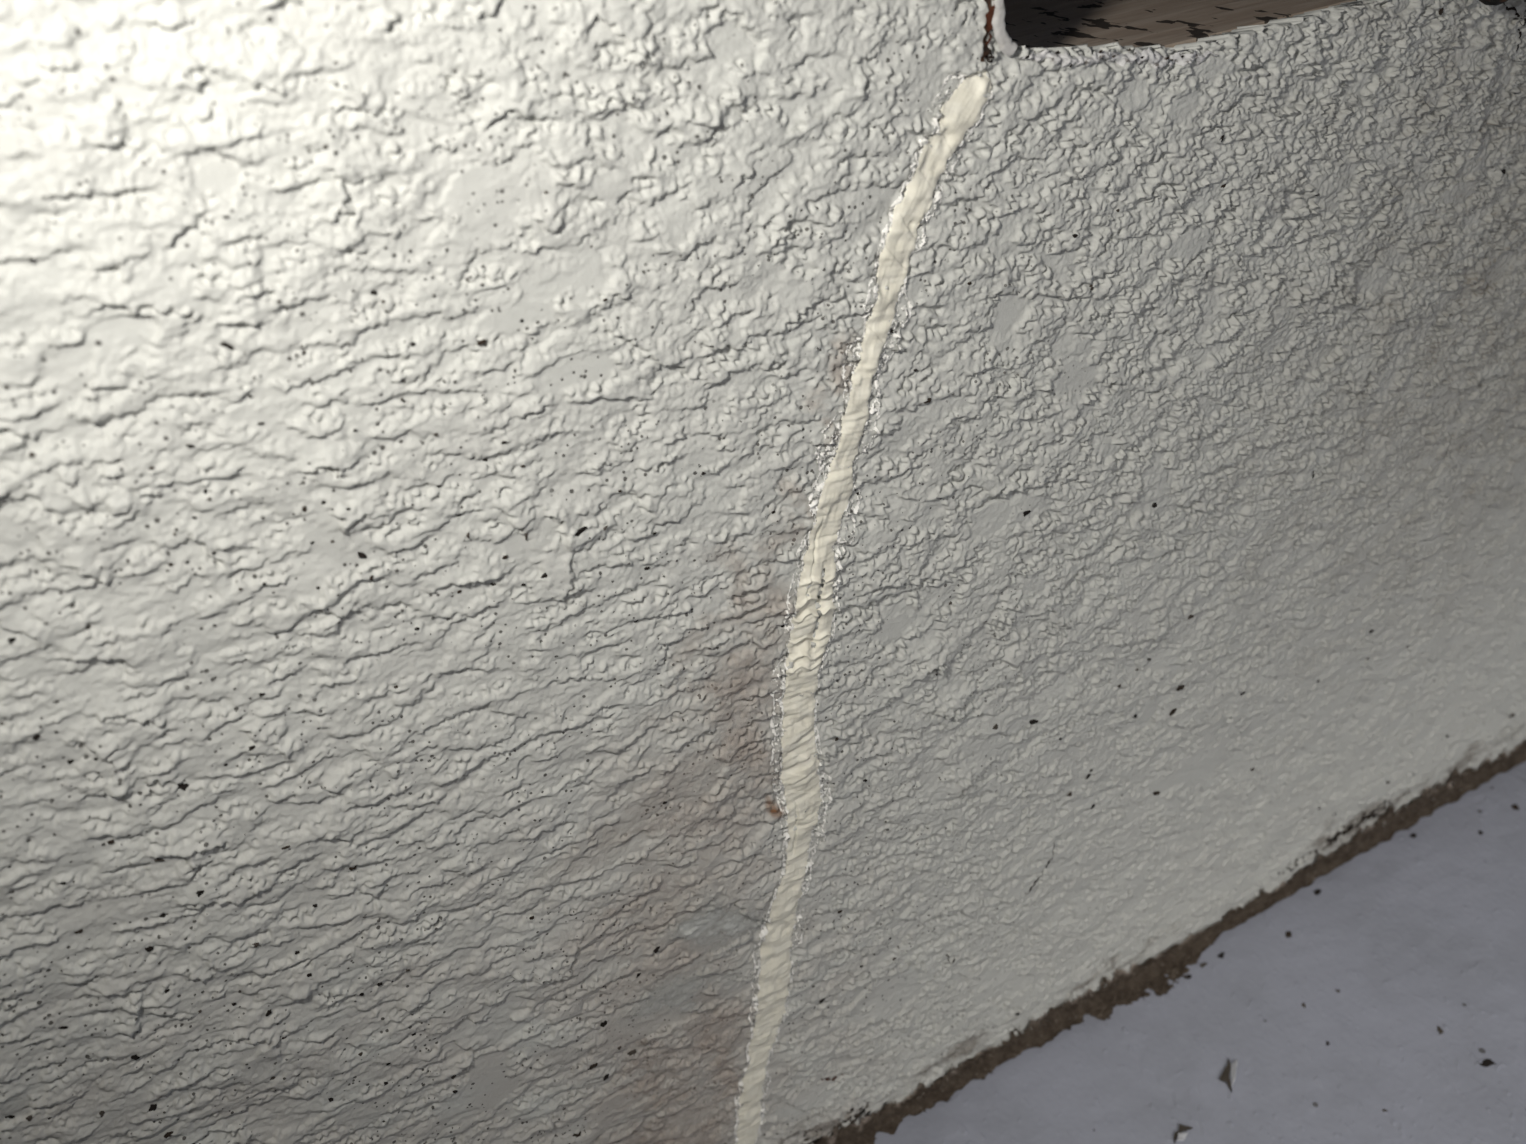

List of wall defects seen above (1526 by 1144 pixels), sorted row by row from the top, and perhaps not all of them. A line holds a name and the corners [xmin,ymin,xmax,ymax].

crack [733,0,995,1144]
corrosion [985,0,995,45]